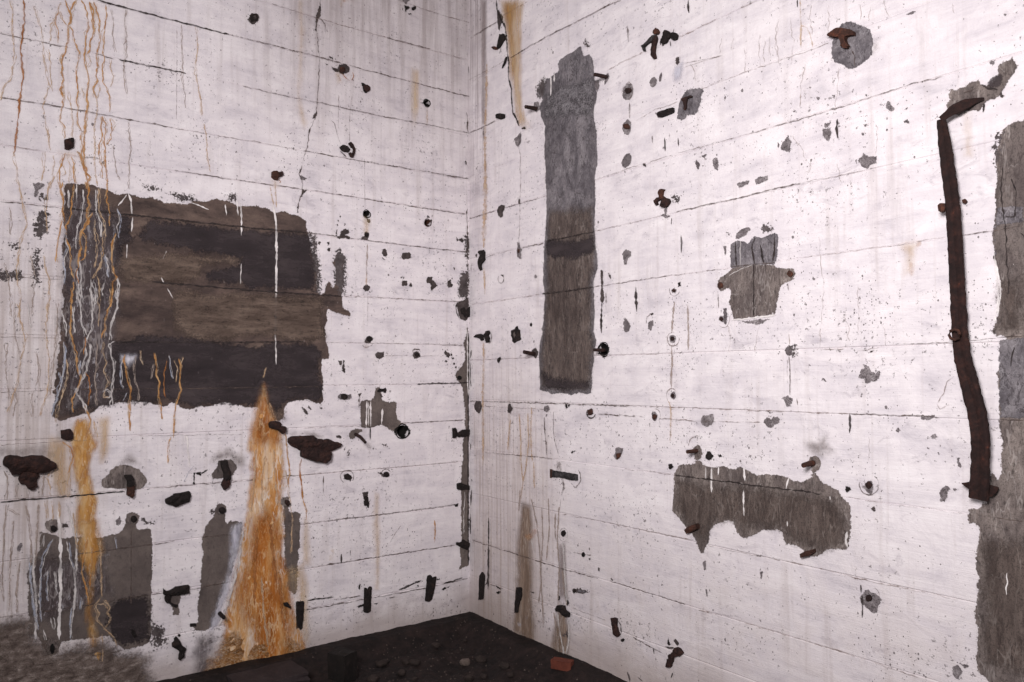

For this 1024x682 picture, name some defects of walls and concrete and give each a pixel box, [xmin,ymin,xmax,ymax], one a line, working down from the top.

leakage [4,187,120,417]
corrosion [0,0,184,575]
crack [0,0,641,302]
crack [543,275,671,295]
crack [677,183,799,212]
peeling [717,222,795,325]
spalling [946,58,1018,115]
peeling [952,120,1024,682]
leakage [0,465,153,682]
corrosion [208,396,307,670]